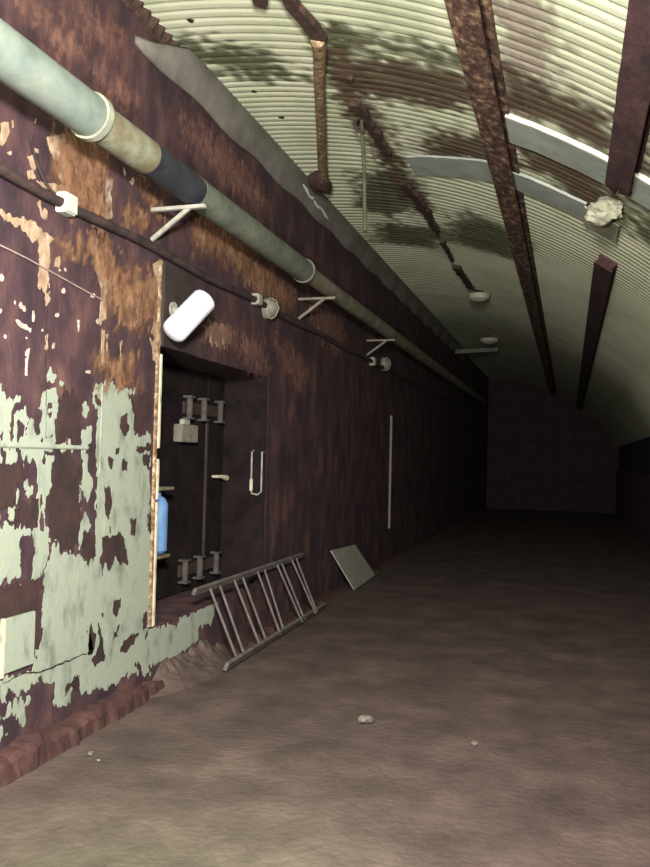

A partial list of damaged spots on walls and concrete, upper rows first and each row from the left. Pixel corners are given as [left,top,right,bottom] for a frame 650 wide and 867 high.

water stain [176,32,311,85]
water stain [491,0,615,156]
peeling [0,120,14,155]
peeling [0,200,67,306]
peeling [27,133,67,193]
rust [52,121,158,334]
rust [121,173,166,235]
water stain [319,21,512,259]
water stain [515,145,650,243]
peeling [14,301,55,376]
peeling [90,264,109,365]
peeling [0,367,218,741]